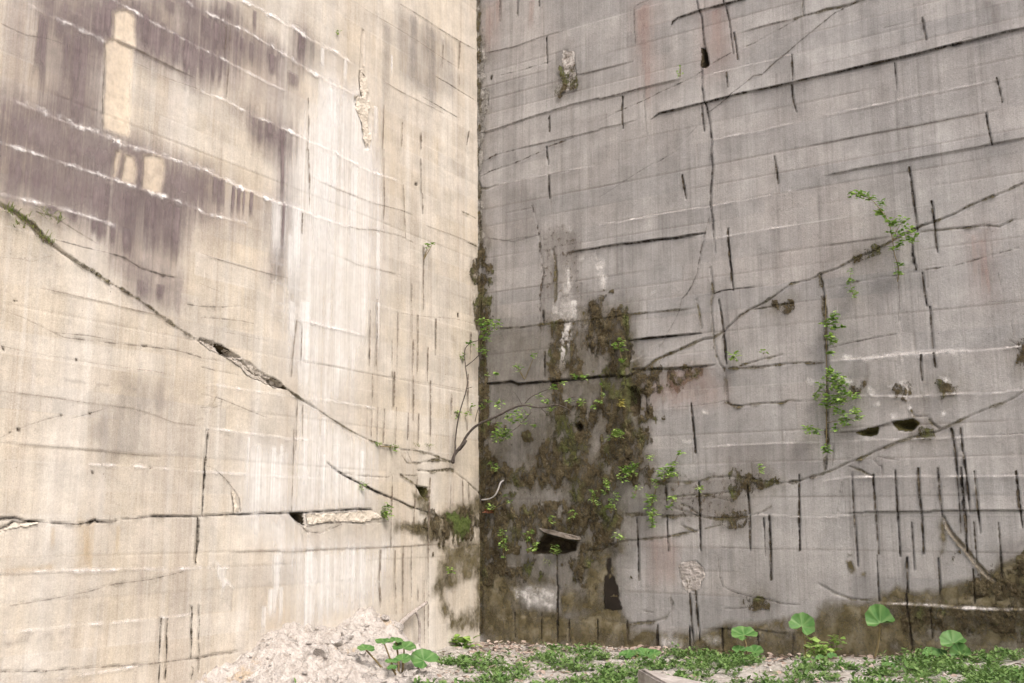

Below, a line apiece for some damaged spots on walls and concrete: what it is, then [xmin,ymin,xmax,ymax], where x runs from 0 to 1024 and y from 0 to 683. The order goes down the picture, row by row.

spalling [701,48,709,68]
spalling [561,50,576,92]
damp [0,0,380,401]
crack [10,210,215,358]
crack [218,0,1019,619]
damp [493,232,631,623]
spalling [856,427,879,436]
spalling [893,419,920,431]
crack [0,515,185,527]
spalling [289,510,382,525]
spalling [532,535,577,555]
crack [628,611,667,625]